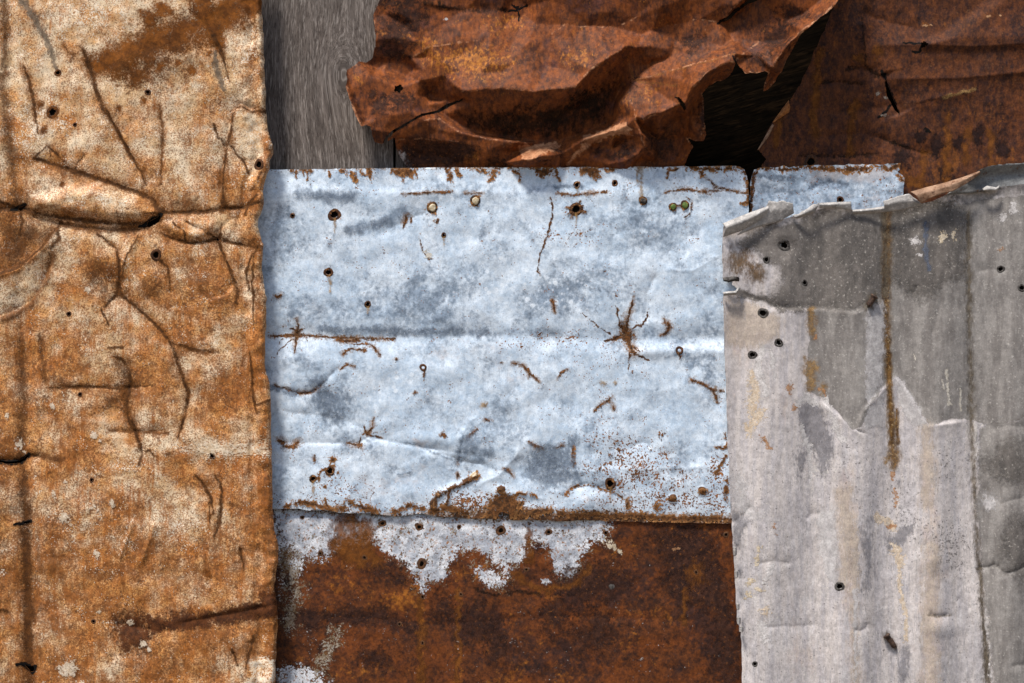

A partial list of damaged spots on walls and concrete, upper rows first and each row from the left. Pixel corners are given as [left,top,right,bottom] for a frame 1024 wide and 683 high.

corrosion [20,67,123,195]
corrosion [62,0,264,219]
corrosion [328,0,1024,224]
crack [877,70,900,118]
corrosion [0,204,263,279]
corrosion [86,258,214,443]
corrosion [582,299,650,370]
corrosion [865,212,900,507]
corrosion [0,340,40,683]
corrosion [110,432,742,683]
peeling [273,508,623,638]